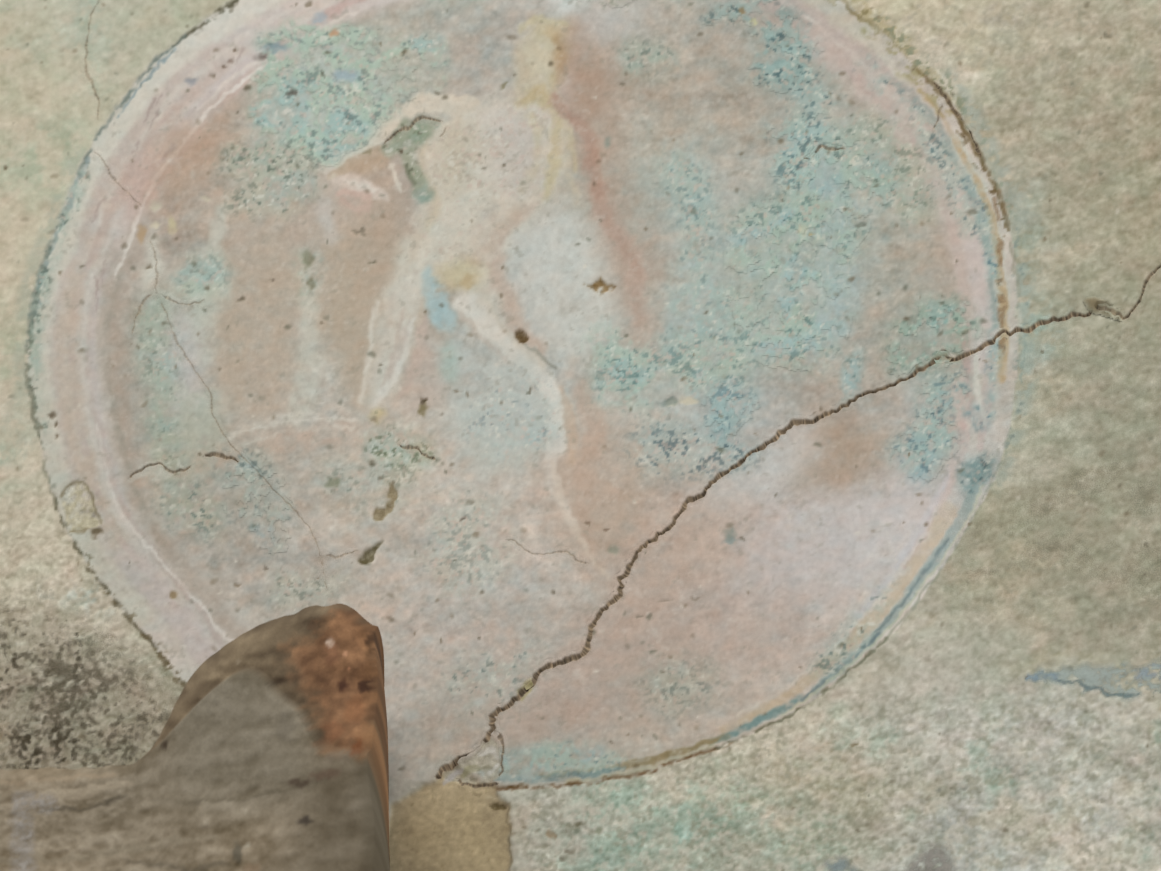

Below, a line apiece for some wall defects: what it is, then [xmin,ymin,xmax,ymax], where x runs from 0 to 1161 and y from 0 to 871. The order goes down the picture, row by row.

crack [81,0,106,120]
crack [91,148,144,210]
crack [126,238,359,592]
crack [432,259,1161,793]
damp [9,644,136,769]